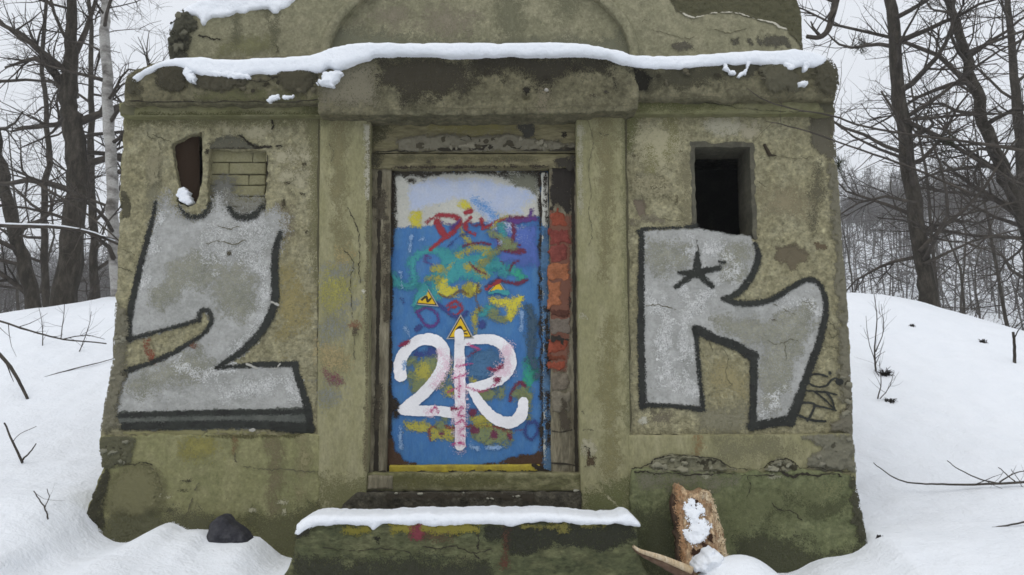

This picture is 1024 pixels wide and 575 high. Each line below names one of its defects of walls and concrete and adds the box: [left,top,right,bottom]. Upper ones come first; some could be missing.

spalling [167,9,198,59]
spalling [204,121,318,208]
crack [344,207,361,359]
leakage [121,0,807,575]
spalling [362,122,588,432]
spalling [649,453,737,480]
leakage [96,503,216,543]